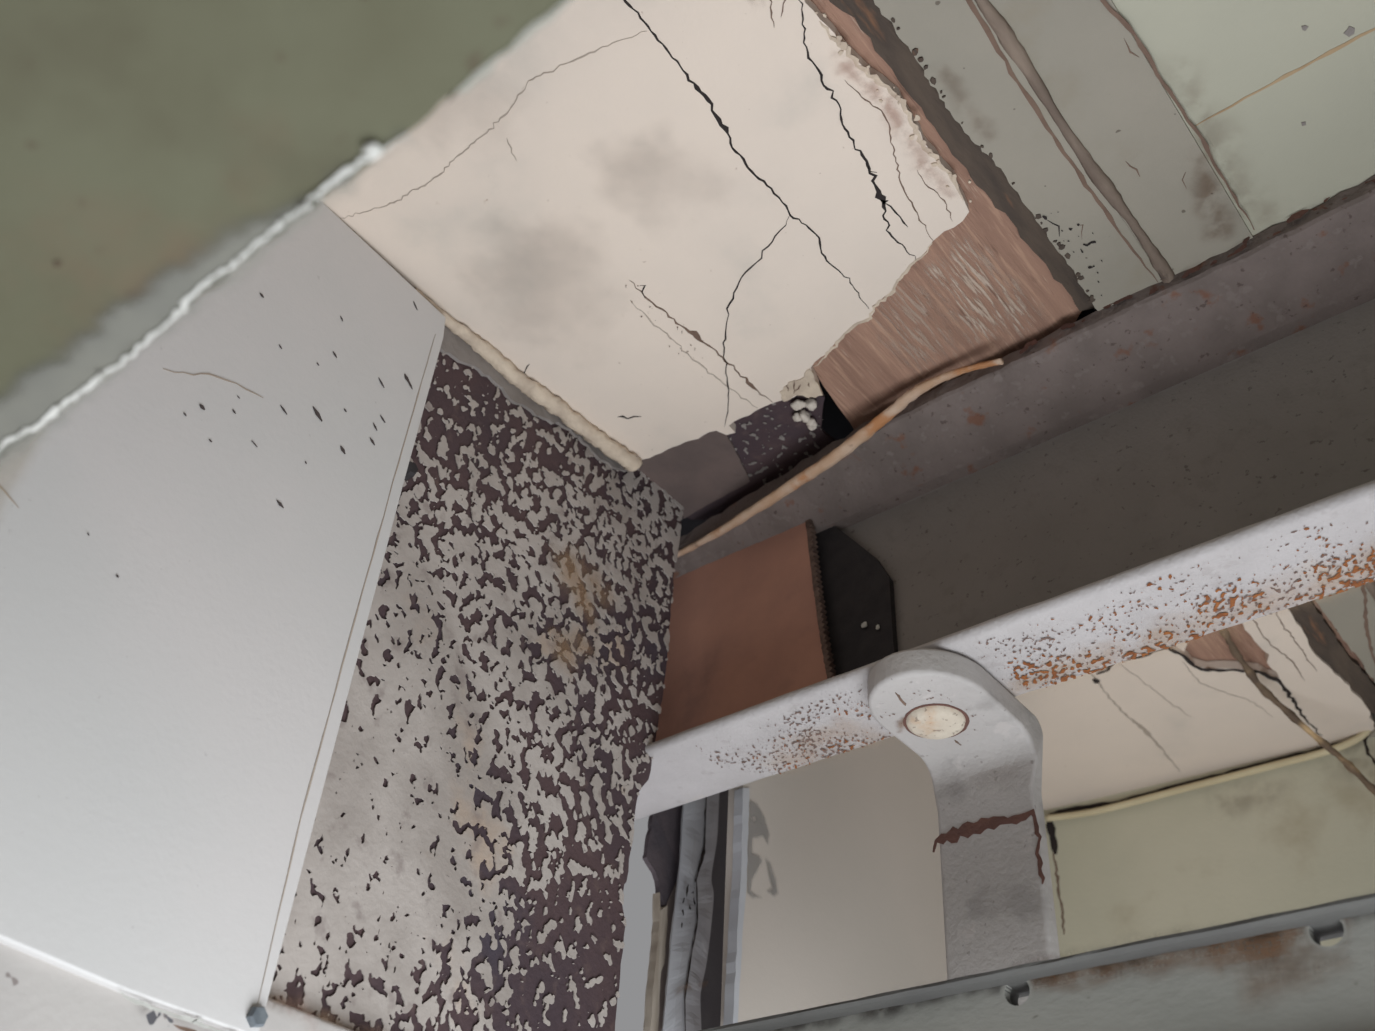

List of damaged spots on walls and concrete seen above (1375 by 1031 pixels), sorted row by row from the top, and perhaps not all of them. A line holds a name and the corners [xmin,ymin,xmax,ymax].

crack [348,0,869,427]
crack [770,0,952,259]
flaking render [815,11,972,203]
peeling [929,243,1030,340]
peeling [1035,213,1102,303]
peeling [268,288,684,1031]
corrosion [973,521,1375,690]
crack [1361,585,1375,663]
crack [1046,612,1375,935]